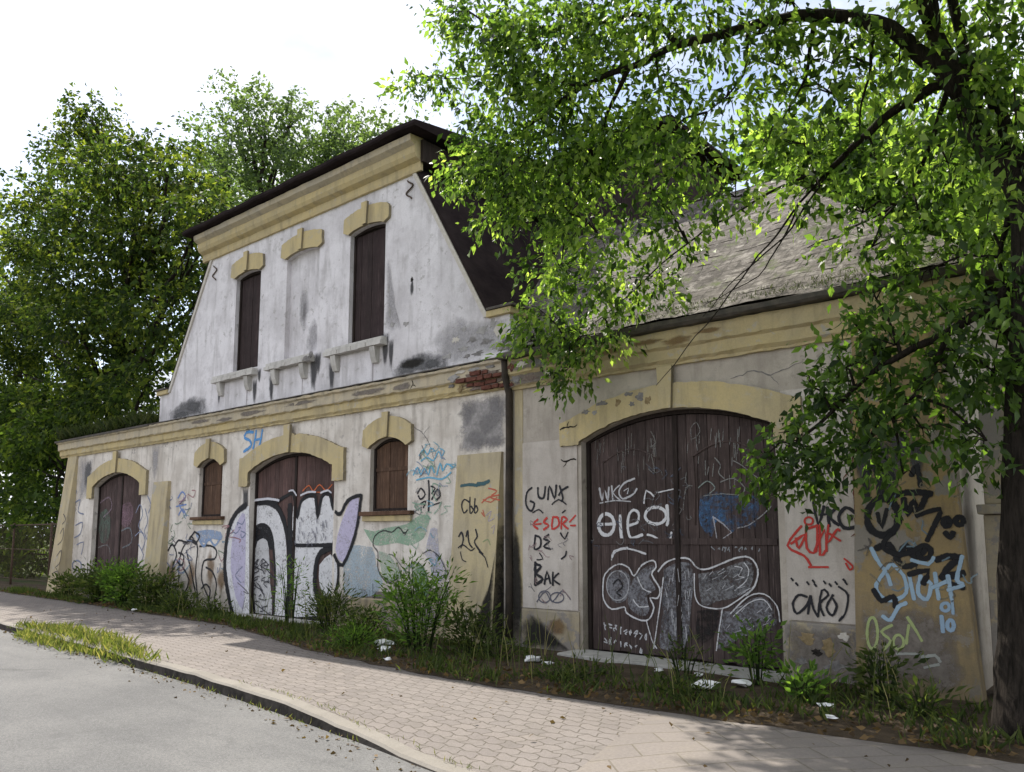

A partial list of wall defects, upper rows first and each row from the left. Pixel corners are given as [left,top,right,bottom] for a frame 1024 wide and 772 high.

water stain [173,370,273,424]
water stain [353,336,446,396]
flaking render [440,318,557,451]
flaking render [582,392,651,415]
crack [730,361,803,385]